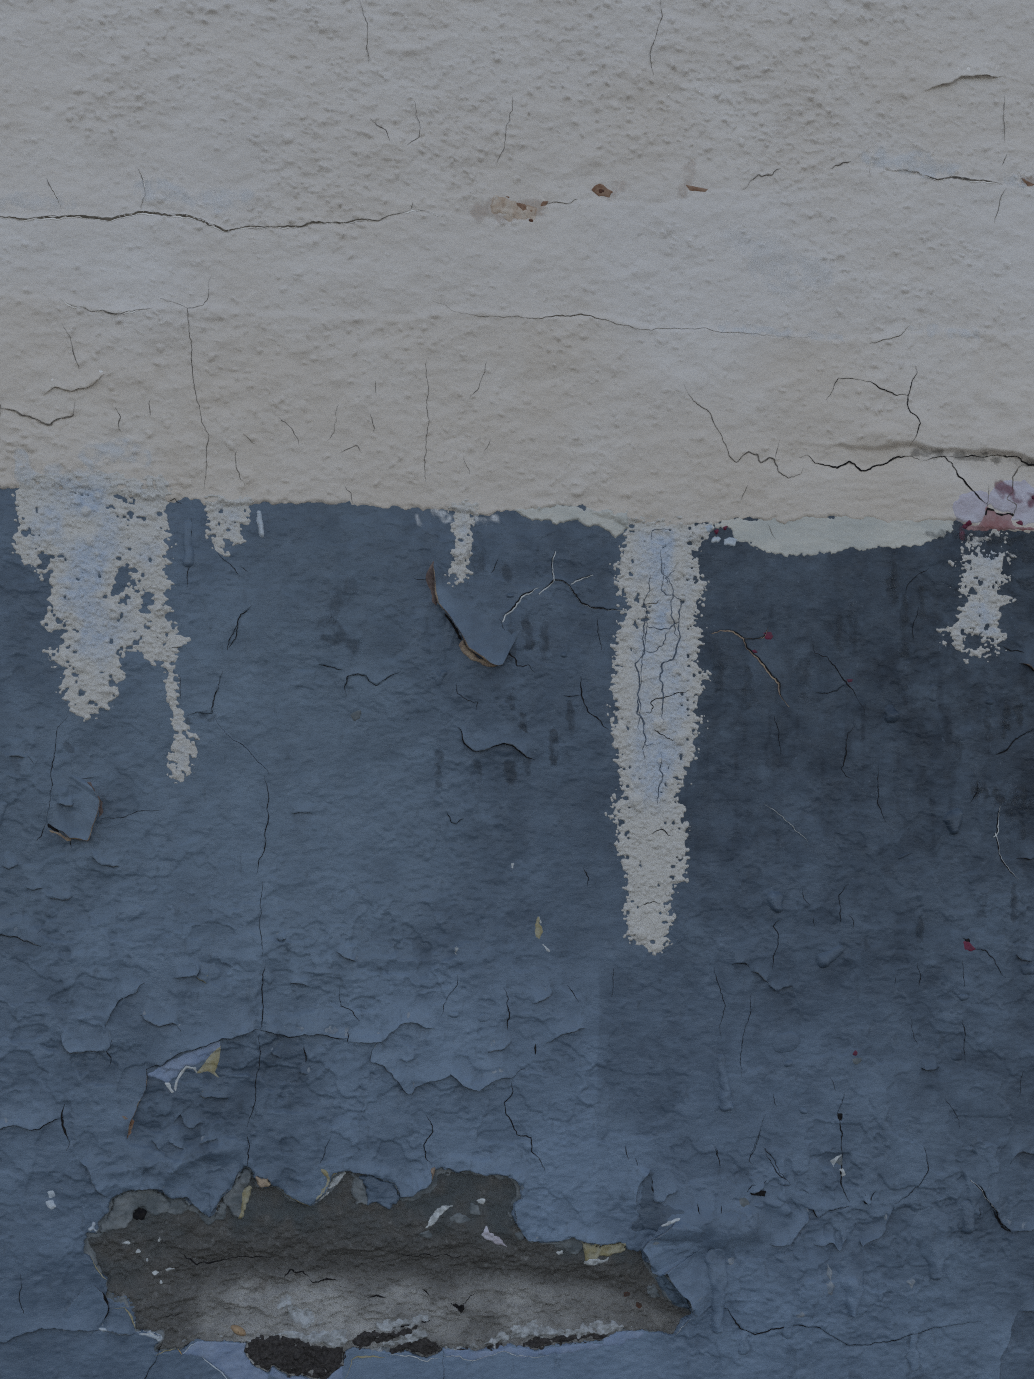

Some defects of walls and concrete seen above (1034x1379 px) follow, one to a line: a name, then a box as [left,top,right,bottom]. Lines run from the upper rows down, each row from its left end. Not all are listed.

crack [0,168,446,232]
crack [687,369,1034,513]
peeling [952,480,1034,529]
peeling [417,560,533,671]
damp [605,510,715,956]
peeling [535,917,550,952]
spalling [0,952,739,1379]
peeling [768,1188,894,1252]